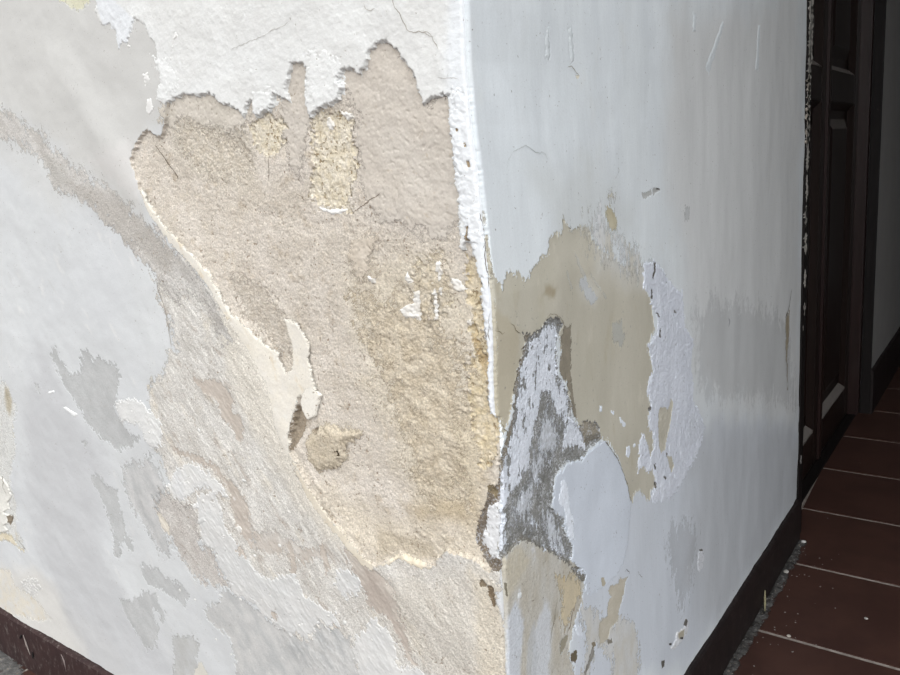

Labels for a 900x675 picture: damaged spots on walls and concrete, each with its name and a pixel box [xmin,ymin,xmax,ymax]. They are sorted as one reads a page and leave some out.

crack [364,0,437,46]
leakage [0,103,233,348]
flaking render [50,0,706,675]